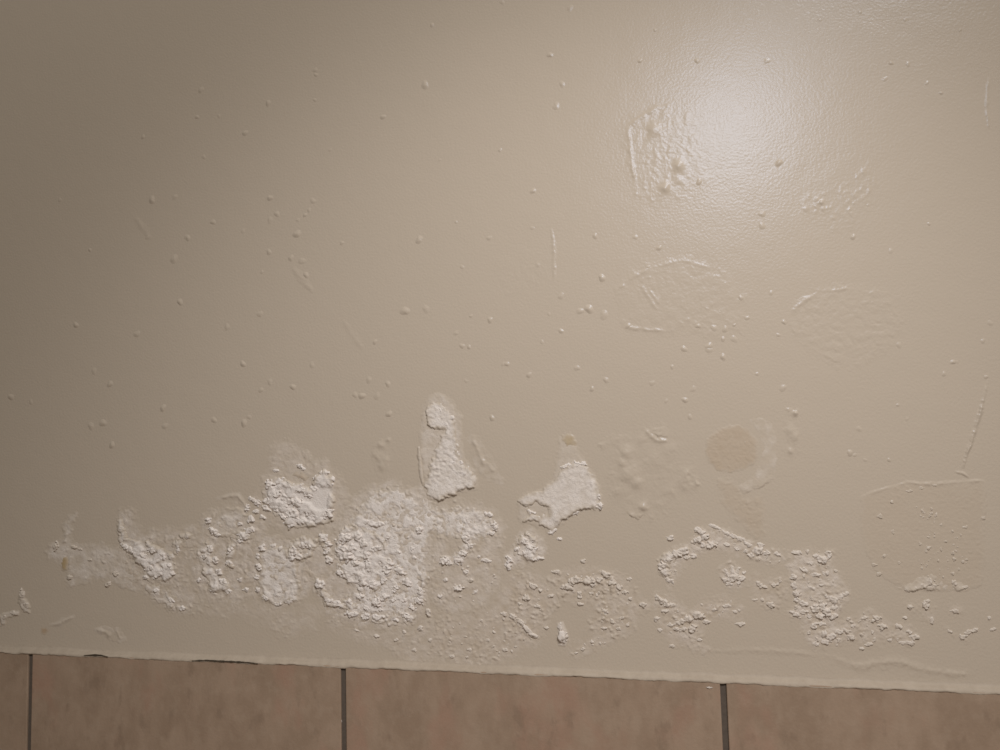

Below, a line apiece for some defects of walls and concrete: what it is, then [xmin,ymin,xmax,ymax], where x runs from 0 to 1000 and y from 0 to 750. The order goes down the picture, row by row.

peeling [417,392,481,502]
peeling [515,432,604,541]
damp [112,437,996,666]